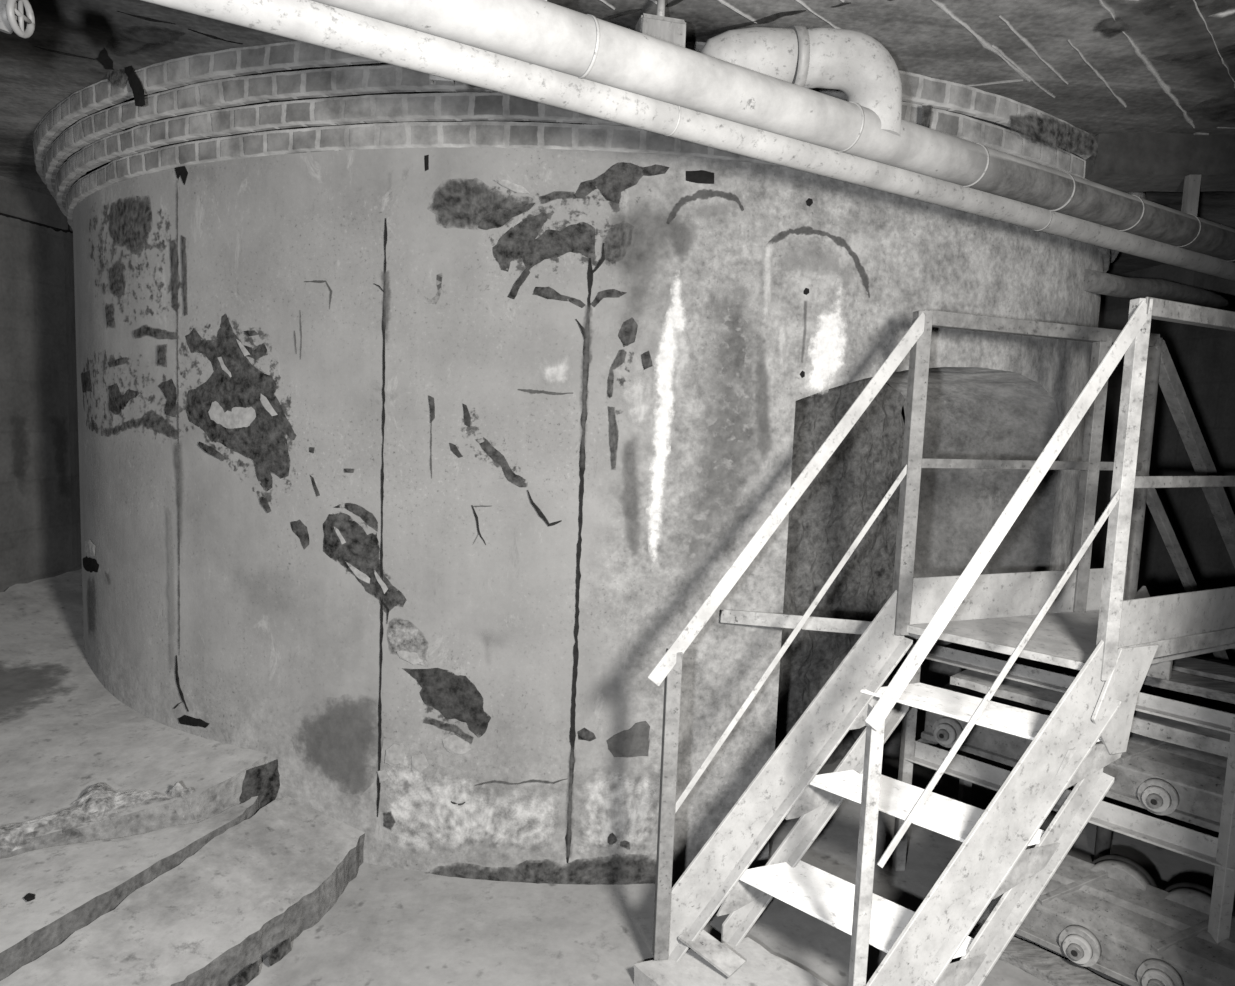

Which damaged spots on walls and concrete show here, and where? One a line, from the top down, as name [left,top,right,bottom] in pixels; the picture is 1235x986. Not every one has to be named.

damp [1095,0,1235,121]
spalling [432,162,669,299]
spalling [686,170,714,184]
spalling [81,197,297,513]
damp [622,276,690,562]
damp [690,244,786,550]
damp [0,665,68,722]
spalling [0,782,195,851]
damp [302,700,374,792]
spalling [290,503,491,754]
peeling [377,721,660,885]